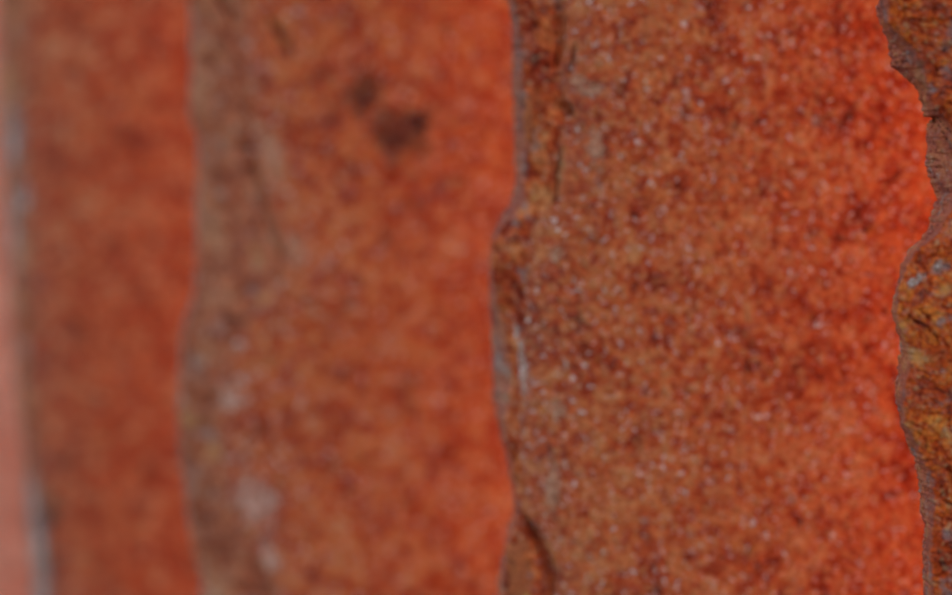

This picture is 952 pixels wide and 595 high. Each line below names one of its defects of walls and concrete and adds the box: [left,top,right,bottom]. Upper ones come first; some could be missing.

spalling [876,0,952,595]